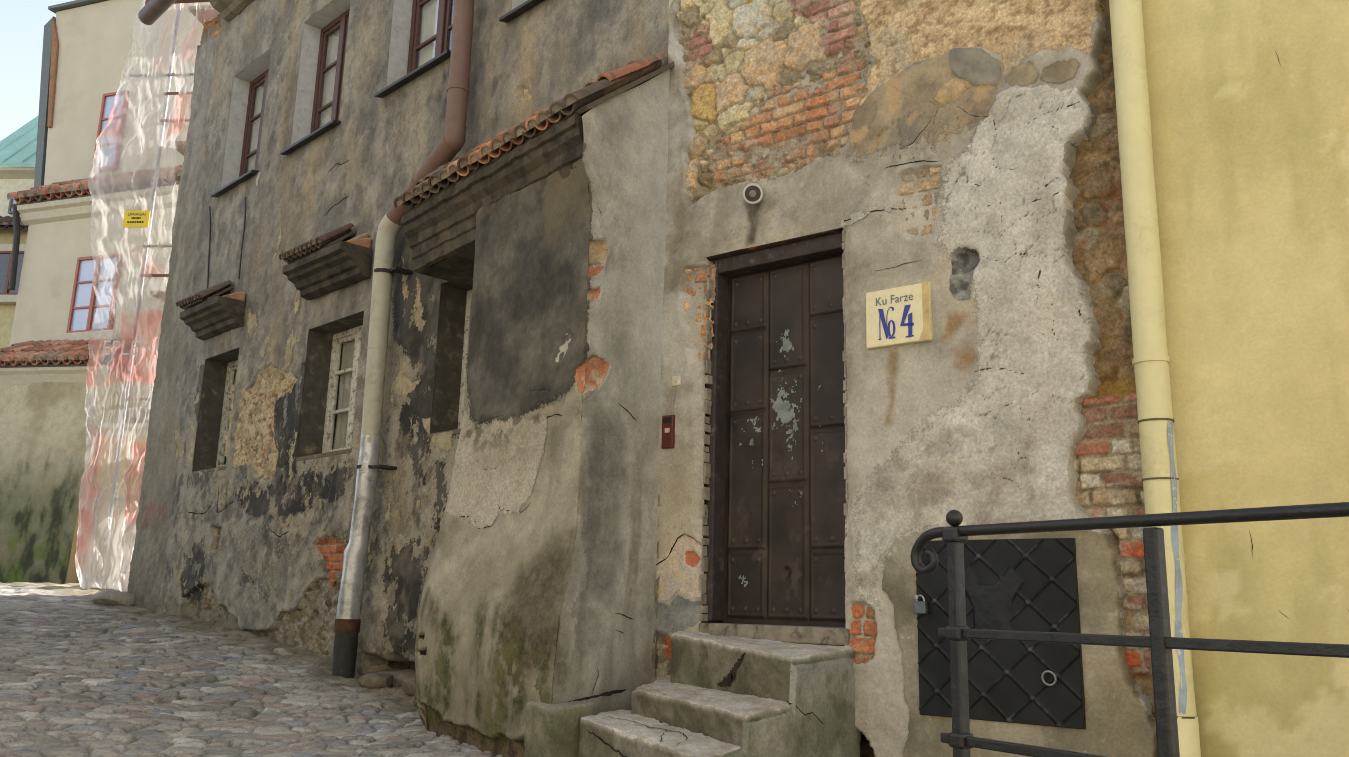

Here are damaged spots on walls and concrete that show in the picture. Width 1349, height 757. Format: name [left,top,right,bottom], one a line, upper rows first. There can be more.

crack [886,91,1081,340]
peeling [401,256,427,331]
spalling [575,355,609,396]
flaking render [676,0,1155,718]
crack [975,368,1056,487]
flaking render [161,290,360,661]
flaking render [361,355,548,610]
crack [656,533,698,566]
flaking render [656,535,705,601]
crack [568,668,688,757]
flaking render [652,631,672,680]
crack [717,653,745,687]